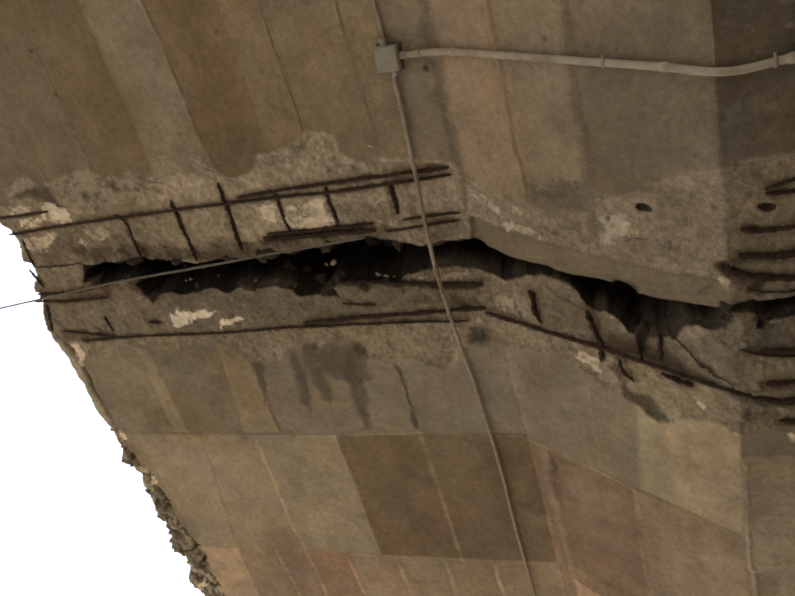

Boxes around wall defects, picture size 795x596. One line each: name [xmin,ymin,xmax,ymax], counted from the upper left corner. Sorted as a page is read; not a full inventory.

water stain [290,344,370,429]
spalling [0,130,795,434]
crack [33,236,795,389]